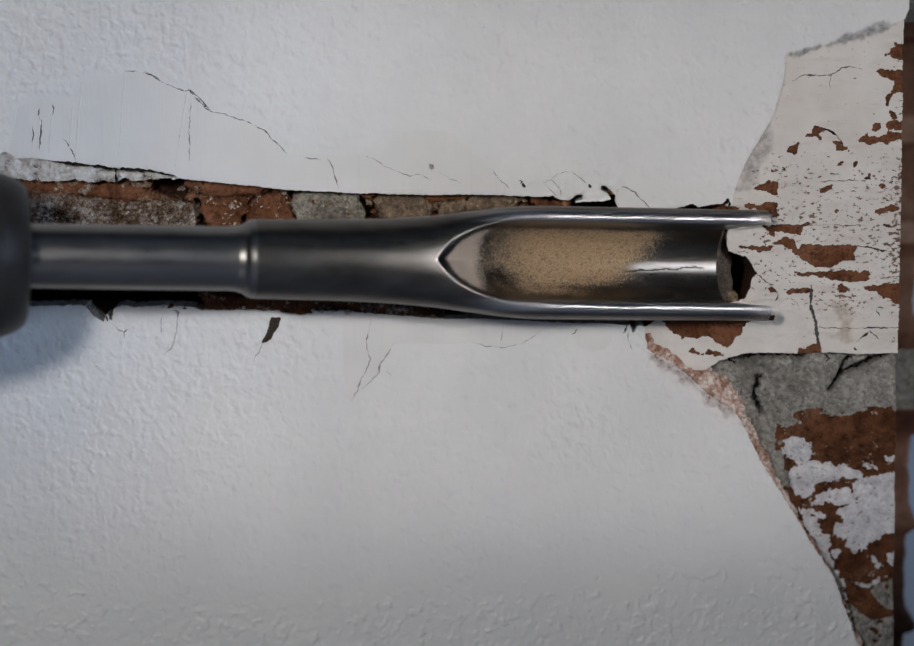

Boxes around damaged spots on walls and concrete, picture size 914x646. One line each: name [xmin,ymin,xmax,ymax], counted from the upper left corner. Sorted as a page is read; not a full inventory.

crack [32,70,339,188]
flaking render [615,187,649,208]
peeling [711,168,899,304]
peeling [787,125,826,155]
peeling [833,141,858,167]
peeling [858,42,902,145]
crack [353,323,391,398]
crack [728,273,899,410]
spalling [645,320,897,646]